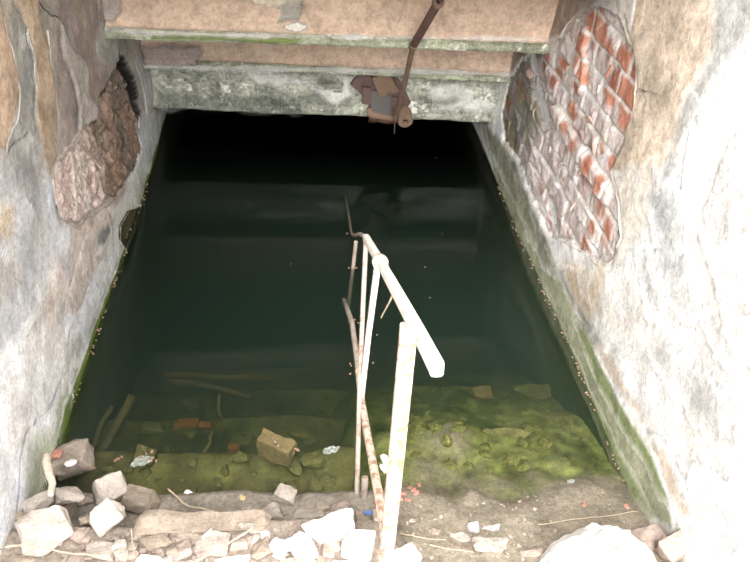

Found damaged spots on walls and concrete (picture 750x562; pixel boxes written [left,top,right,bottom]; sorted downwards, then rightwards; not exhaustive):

flaking render [13,0,154,323]
flaking render [502,0,710,266]
damp [67,322,87,370]